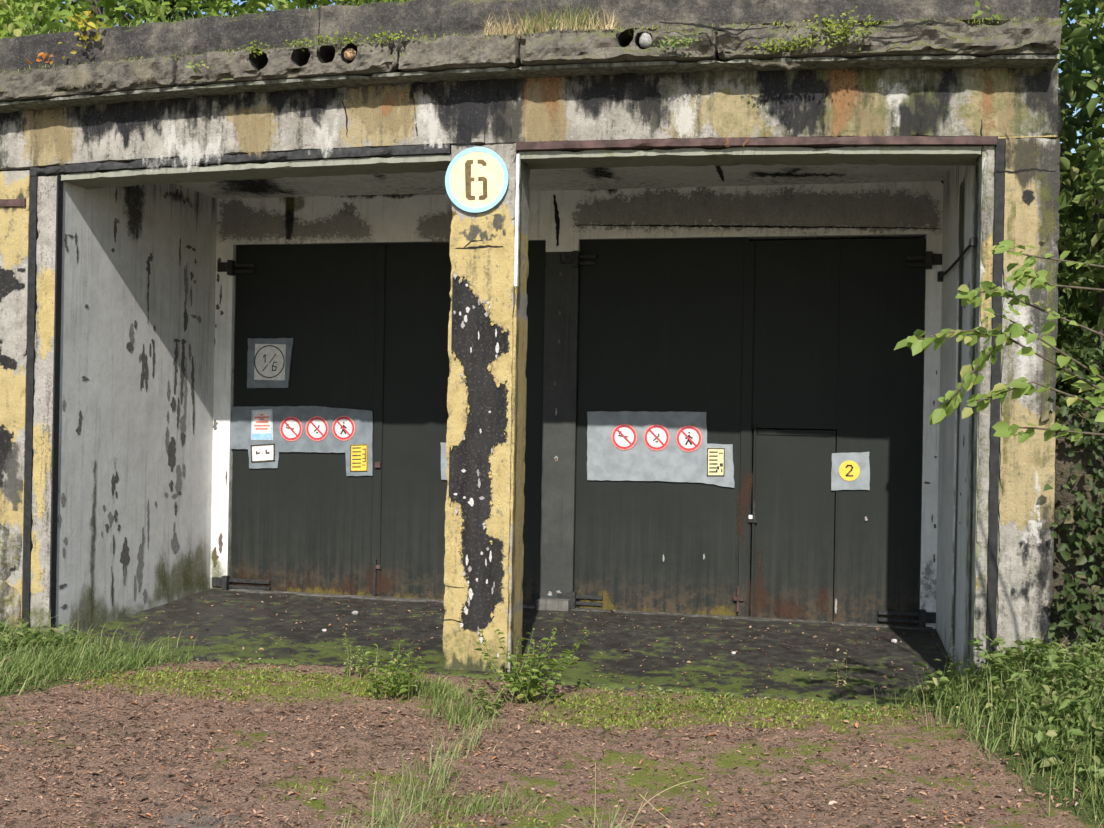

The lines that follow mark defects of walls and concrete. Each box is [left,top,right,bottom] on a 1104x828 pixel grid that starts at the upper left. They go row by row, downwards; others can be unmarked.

damp [71,88,347,168]
damp [410,79,518,148]
damp [567,73,695,137]
damp [755,70,834,137]
corrosion [831,68,887,137]
damp [879,68,957,147]
peeling [0,266,25,301]
peeling [0,340,17,370]
peeling [0,424,14,487]
peeling [101,238,202,606]
peeling [449,272,510,644]
damp [1011,474,1050,635]